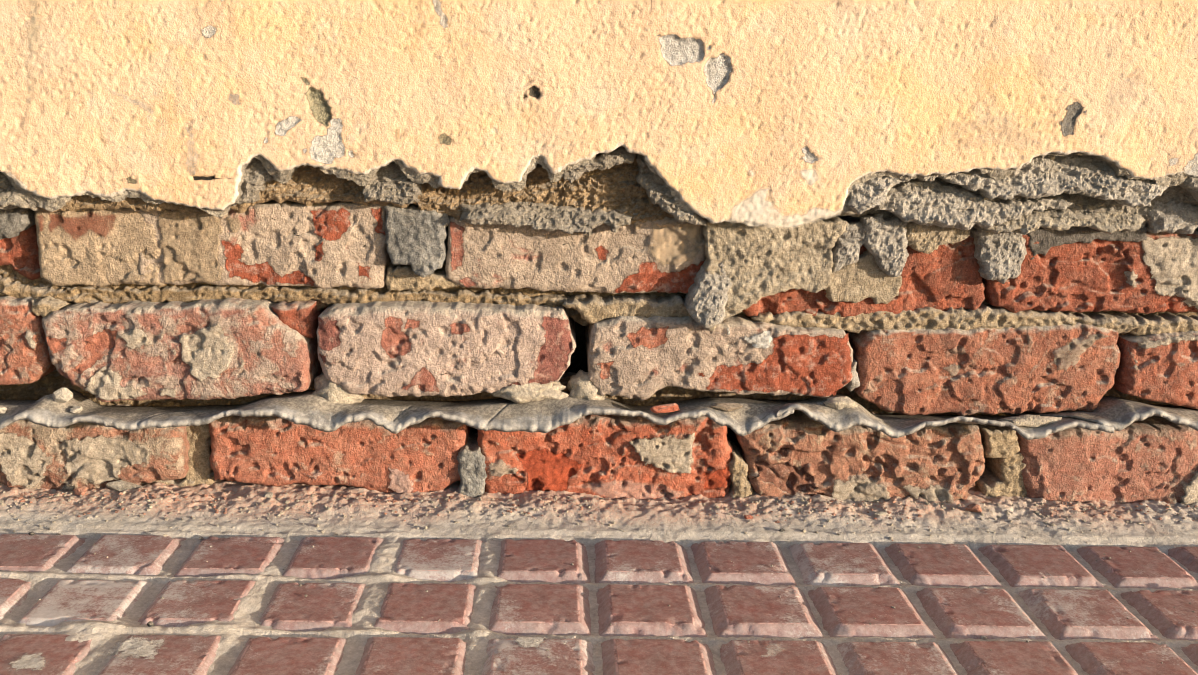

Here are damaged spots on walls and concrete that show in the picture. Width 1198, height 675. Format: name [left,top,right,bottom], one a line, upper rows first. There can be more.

peeling [657,34,732,104]
flaking render [523,86,540,99]
peeling [242,77,379,186]
peeling [1060,101,1087,136]
flaking render [2,169,230,217]
flaking render [392,160,442,188]
flaking render [458,155,596,191]
peeling [731,171,920,227]
flaking render [1101,153,1198,187]
spalling [311,207,351,262]
spalling [221,240,314,286]
spalling [615,260,705,293]